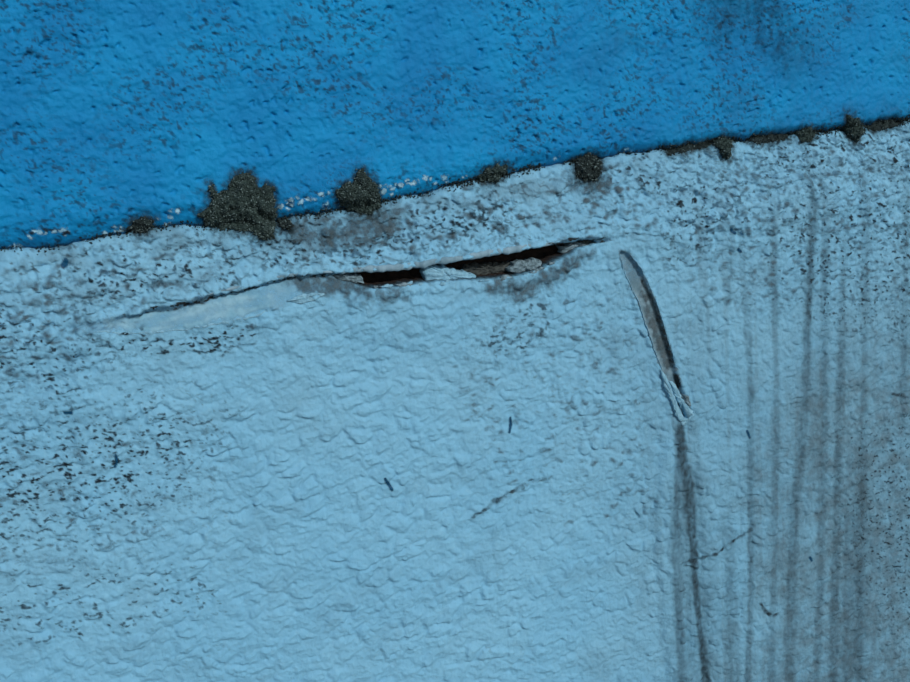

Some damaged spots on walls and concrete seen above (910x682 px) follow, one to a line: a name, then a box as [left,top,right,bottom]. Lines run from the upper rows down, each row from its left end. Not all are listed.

water stain [766,137,828,185]
water stain [260,234,326,267]
crack [123,237,606,316]
water stain [343,194,509,265]
water stain [667,177,724,260]
water stain [770,195,910,314]
spalling [620,251,695,426]
water stain [677,426,701,618]
water stain [699,630,709,682]